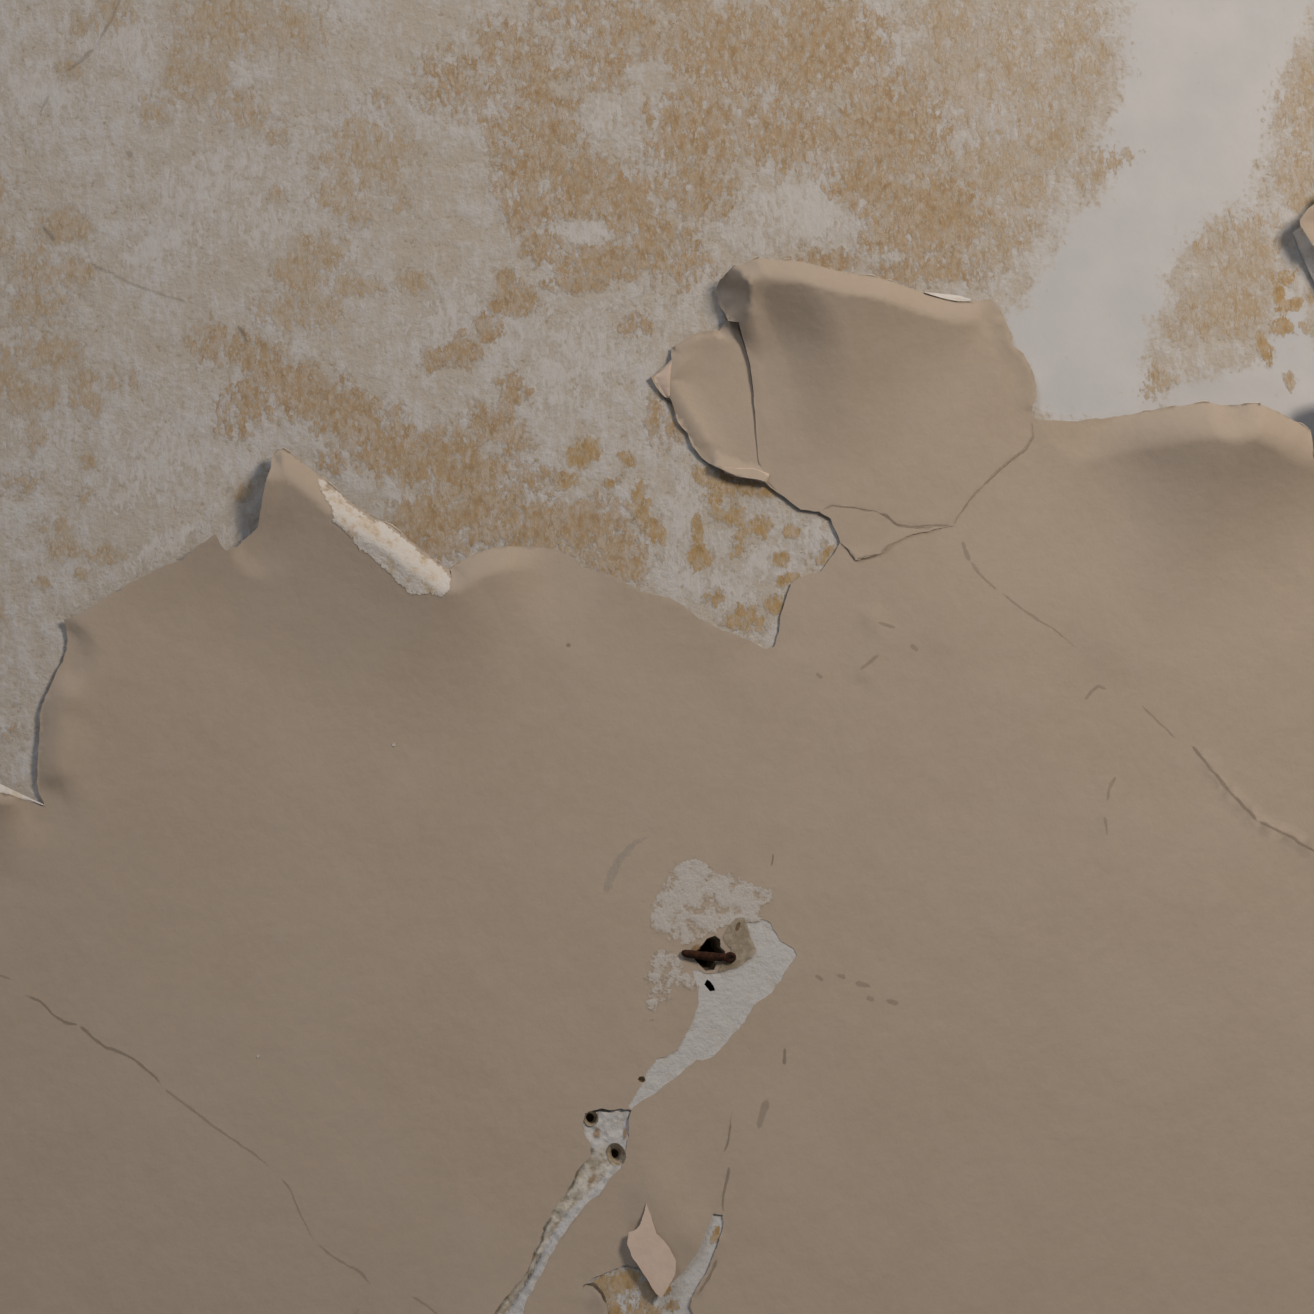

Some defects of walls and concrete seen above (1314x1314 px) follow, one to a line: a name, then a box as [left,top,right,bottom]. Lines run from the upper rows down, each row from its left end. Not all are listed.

damp [1132,37,1314,408]
peeling [1292,205,1314,281]
peeling [261,447,456,651]
peeling [651,256,1037,560]
peeling [1117,400,1314,482]
peeling [0,659,109,888]
spalling [494,857,797,1314]